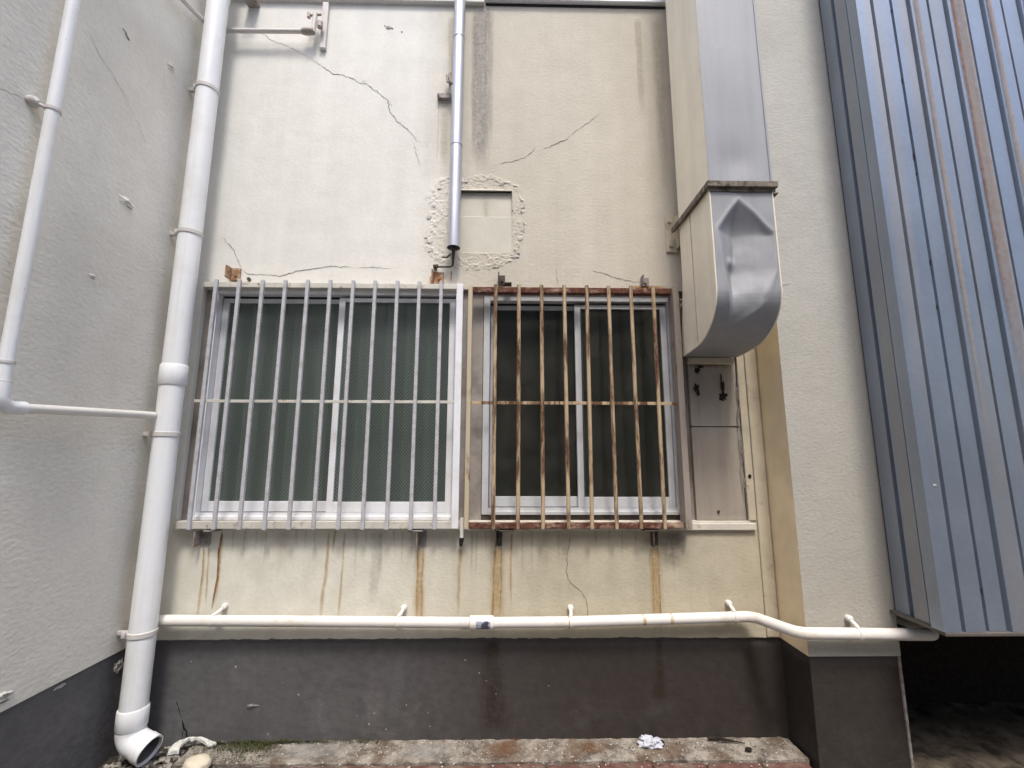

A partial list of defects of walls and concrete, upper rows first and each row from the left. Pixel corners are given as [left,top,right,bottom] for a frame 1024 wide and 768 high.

crack [251,23,426,165]
crack [224,238,389,277]
spalling [422,174,526,271]
rust [212,534,223,601]
crack [566,532,589,632]